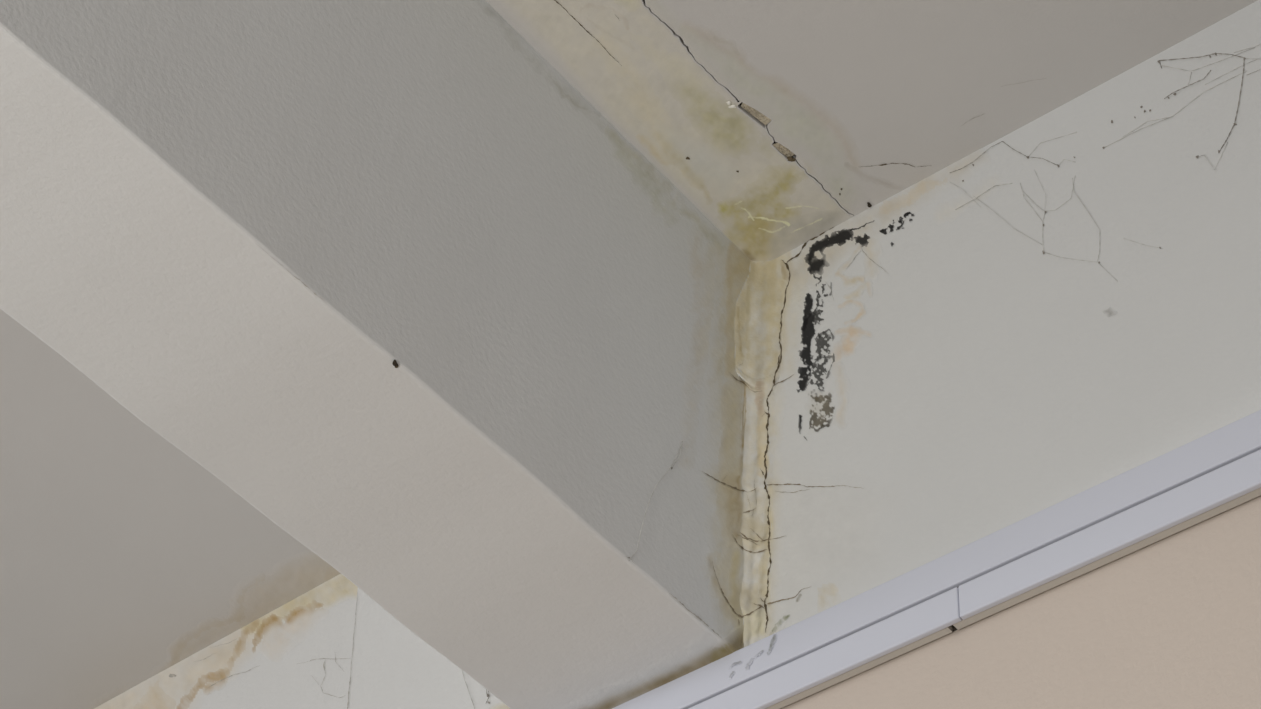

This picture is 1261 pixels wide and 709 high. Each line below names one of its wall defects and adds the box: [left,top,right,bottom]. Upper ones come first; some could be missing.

crack [554,0,619,63]
damp [486,0,1003,647]
crack [760,231,826,633]
damp [79,549,358,709]
crack [671,594,720,637]